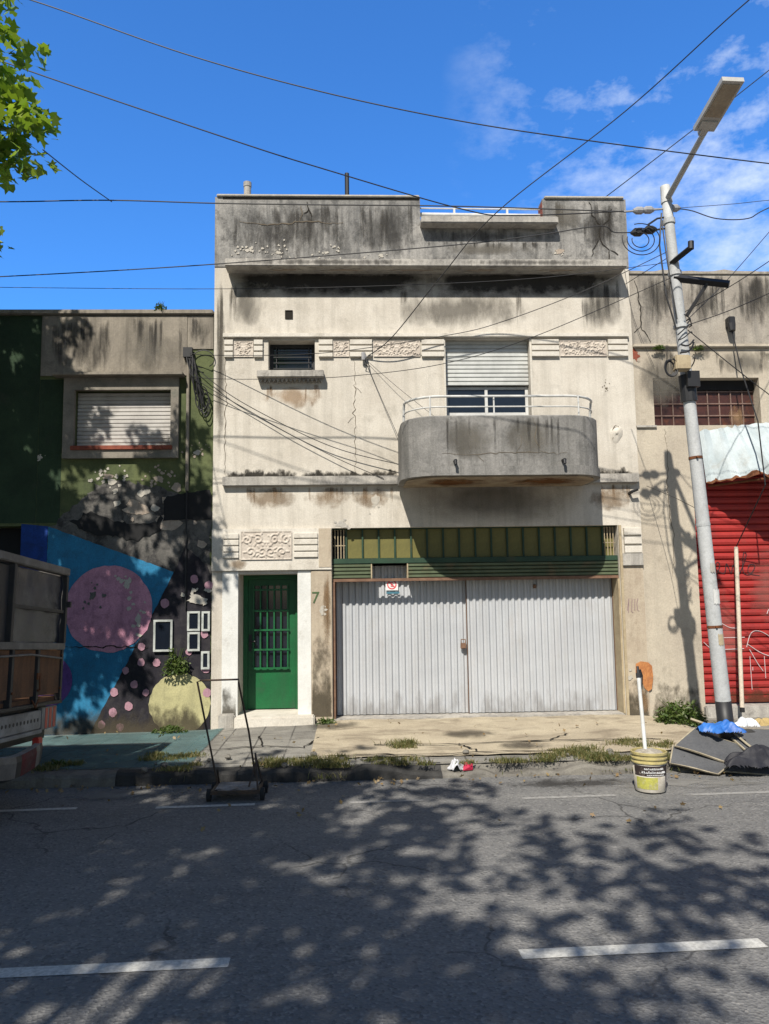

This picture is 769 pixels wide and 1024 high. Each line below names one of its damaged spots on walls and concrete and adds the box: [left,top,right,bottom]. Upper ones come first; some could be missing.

peeling [231,239,302,271]
crack [589,202,618,258]
water stain [415,274,615,321]
crack [350,365,360,458]
flaking render [49,465,213,605]